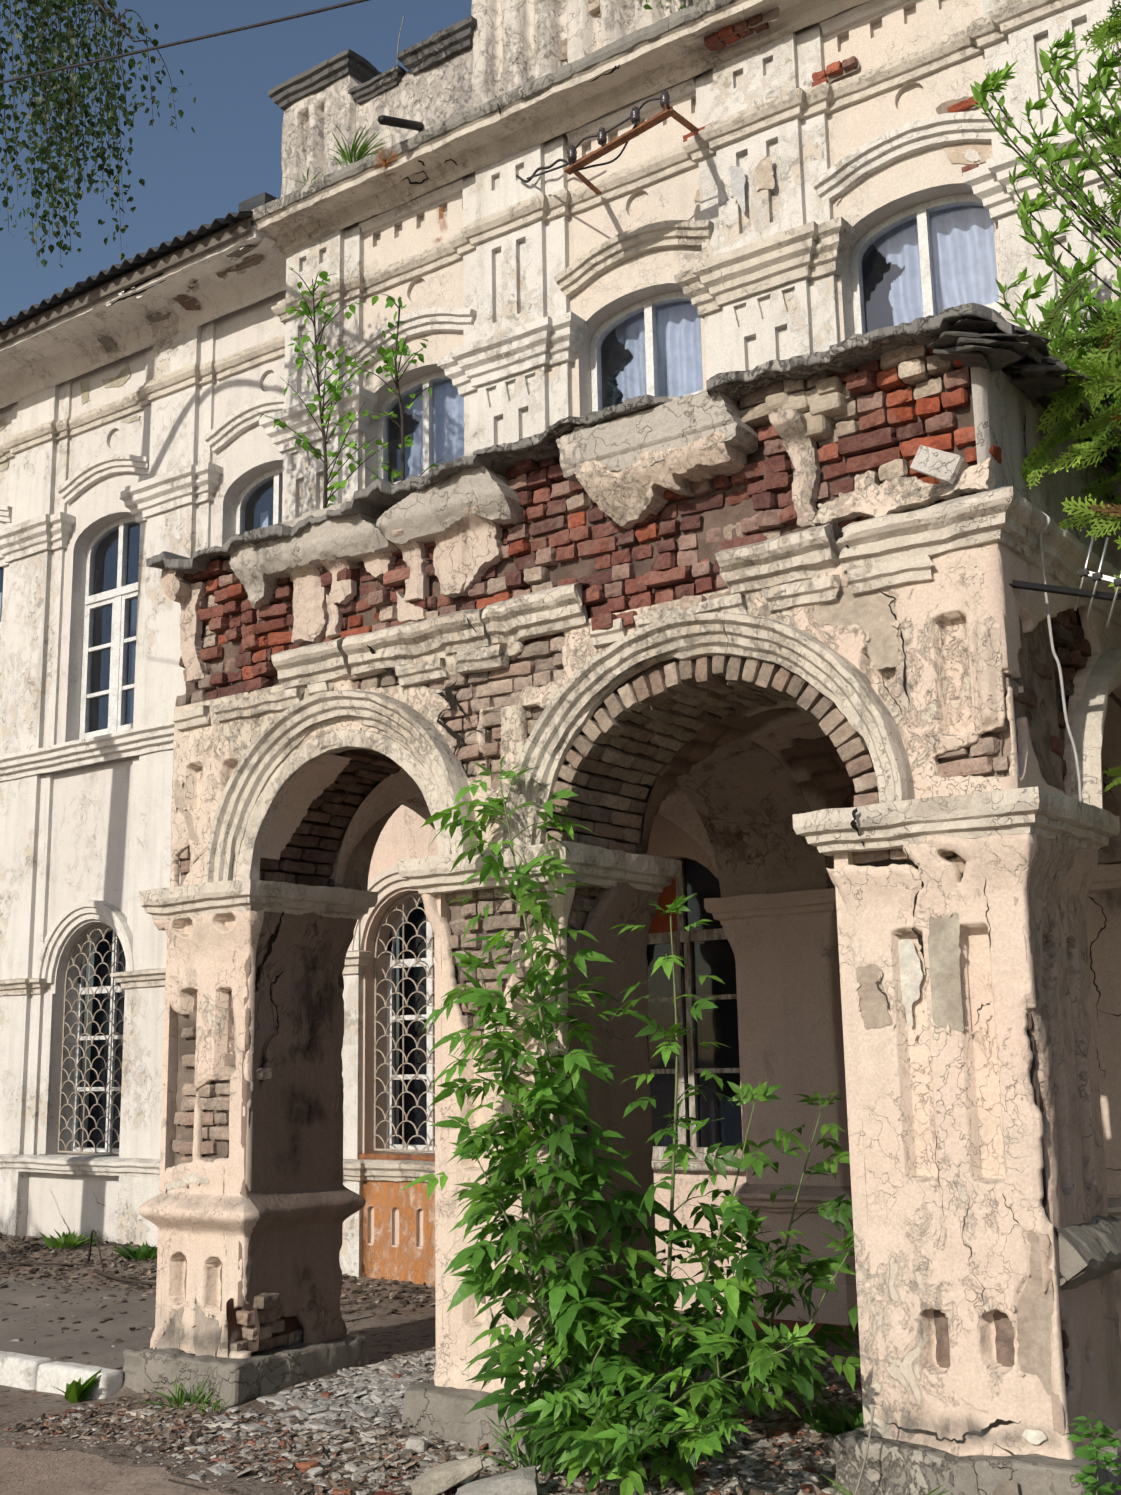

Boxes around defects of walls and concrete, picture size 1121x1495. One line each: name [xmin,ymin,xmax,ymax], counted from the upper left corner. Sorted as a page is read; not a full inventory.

spalling [704,7,779,51]
spalling [812,56,859,87]
spalling [175,319,1090,707]
spalling [936,608,1091,792]
spalling [852,848,914,867]
spalling [945,851,966,880]
crack [255,912,284,1067]
flaking render [855,911,964,1035]
crack [1059,896,1121,1077]
spalling [164,999,236,1191]
crack [886,1419,1021,1455]